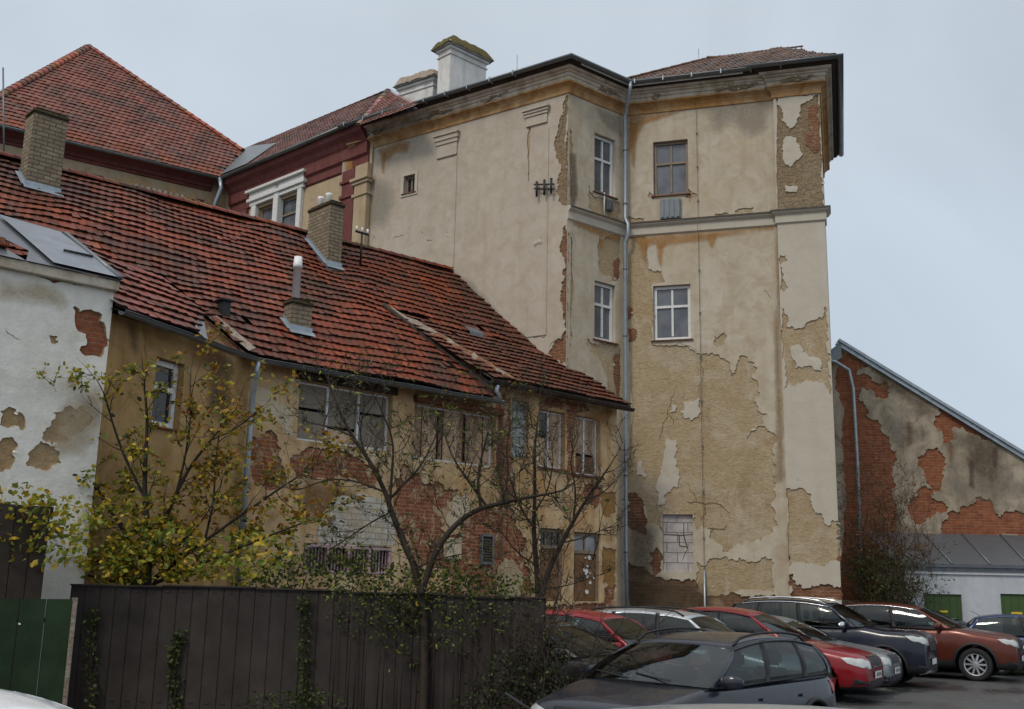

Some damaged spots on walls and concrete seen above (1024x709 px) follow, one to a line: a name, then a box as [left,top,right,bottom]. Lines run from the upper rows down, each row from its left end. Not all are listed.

flaking render [554,95,574,206]
flaking render [776,94,825,209]
flaking render [73,306,110,357]
flaking render [0,406,93,472]
flaking render [250,386,535,597]
flaking render [538,226,1024,611]